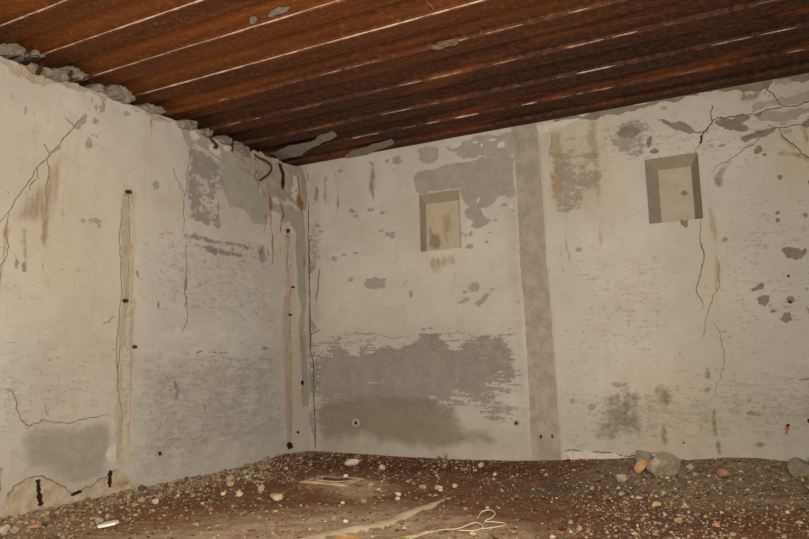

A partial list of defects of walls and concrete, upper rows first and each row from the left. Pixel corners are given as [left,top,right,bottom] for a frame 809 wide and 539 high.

spalling [0,56,110,130]
peeling [554,73,809,156]
crack [695,86,809,172]
crack [0,117,82,281]
peeling [123,107,624,461]
crack [696,220,725,397]
peeling [751,283,795,323]
peeling [781,247,807,260]
spalling [3,469,137,519]